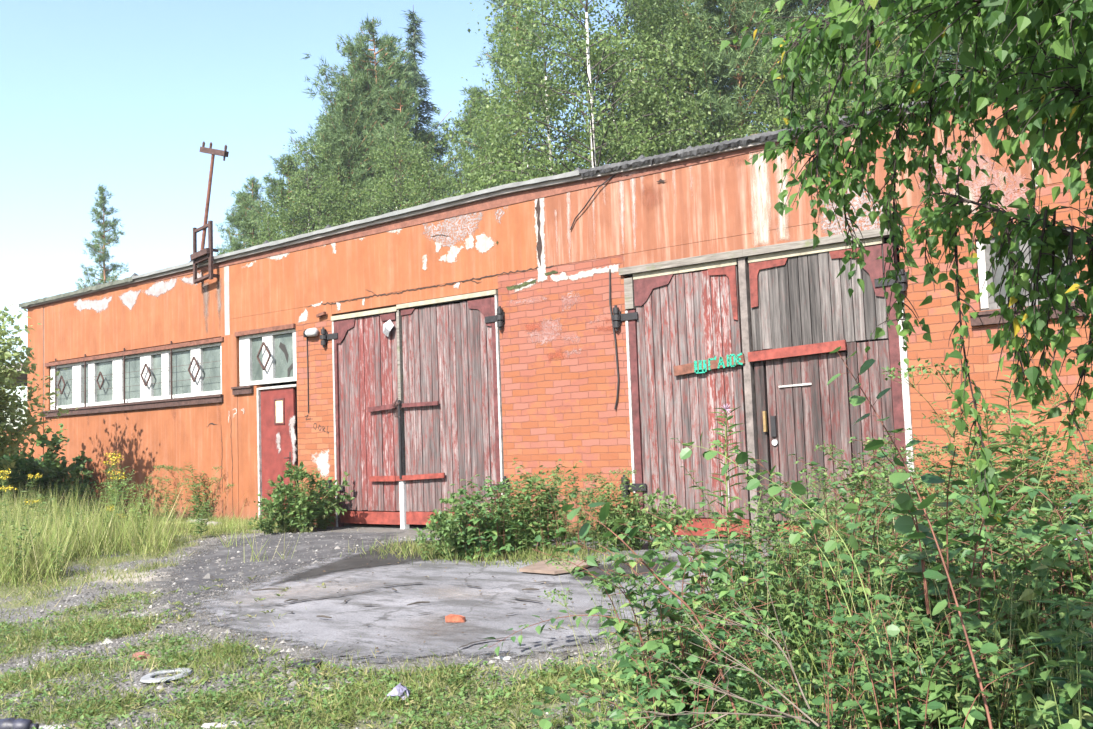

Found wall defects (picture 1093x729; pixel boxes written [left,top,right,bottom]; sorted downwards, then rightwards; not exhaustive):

peeling [74,271,202,313]
crack [309,198,555,307]
peeling [422,207,505,270]
peeling [506,197,619,355]
damp [753,152,787,243]